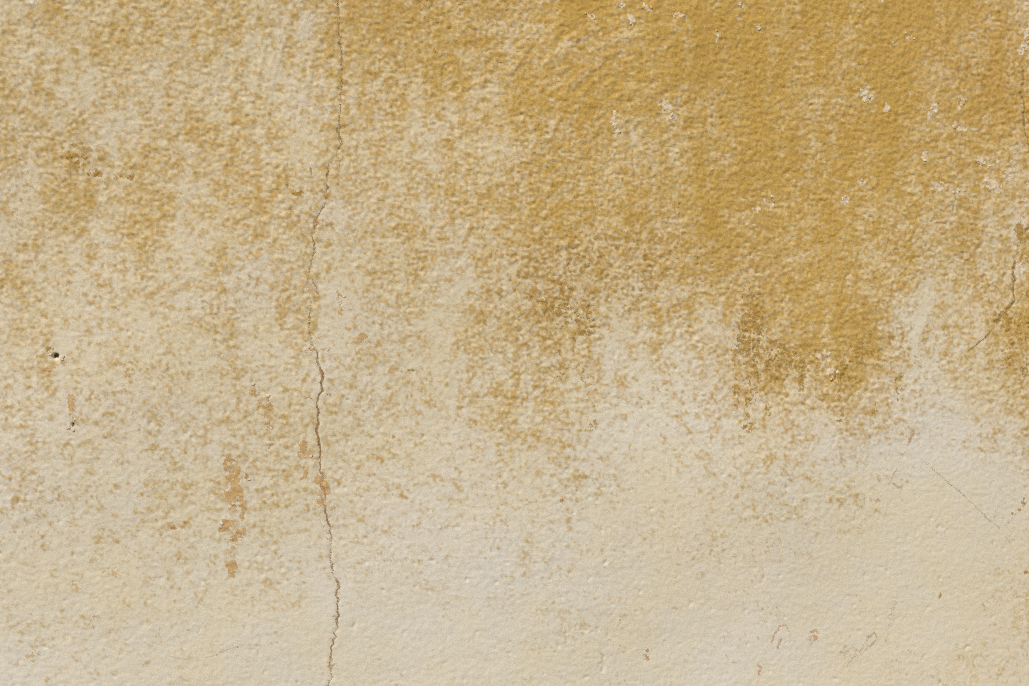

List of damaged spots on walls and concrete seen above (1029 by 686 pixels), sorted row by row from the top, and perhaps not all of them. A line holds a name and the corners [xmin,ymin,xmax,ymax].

water stain [66,143,134,181]
crack [1005,67,1029,146]
crack [306,0,343,686]
water stain [526,261,599,431]
water stain [730,280,810,433]
water stain [834,328,880,423]
crack [967,222,1029,353]
water stain [1002,313,1029,388]